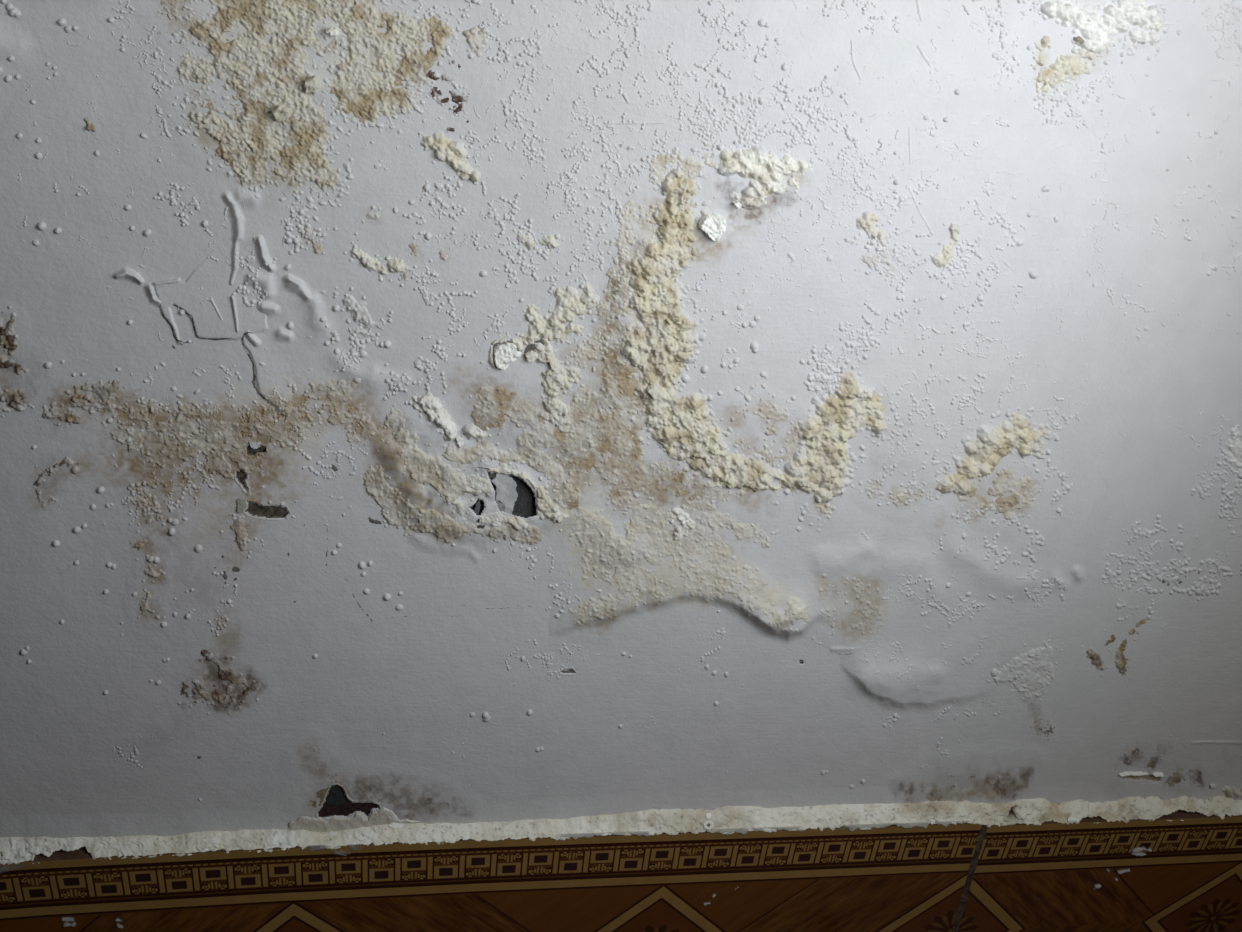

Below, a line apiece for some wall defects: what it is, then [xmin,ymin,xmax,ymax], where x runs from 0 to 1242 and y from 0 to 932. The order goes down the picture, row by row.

flaking render [141,0,486,222]
crack [158,304,279,408]
water stain [69,204,646,633]
flaking render [103,134,1059,634]
water stain [520,373,1056,654]
peeling [0,771,1242,844]